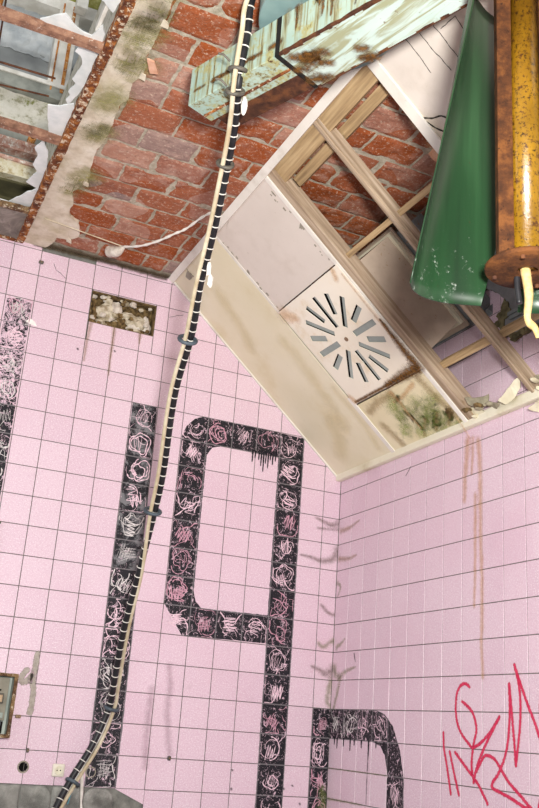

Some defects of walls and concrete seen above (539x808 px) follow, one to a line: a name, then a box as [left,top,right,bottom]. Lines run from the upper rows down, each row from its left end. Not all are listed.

peeling [24,0,173,247]